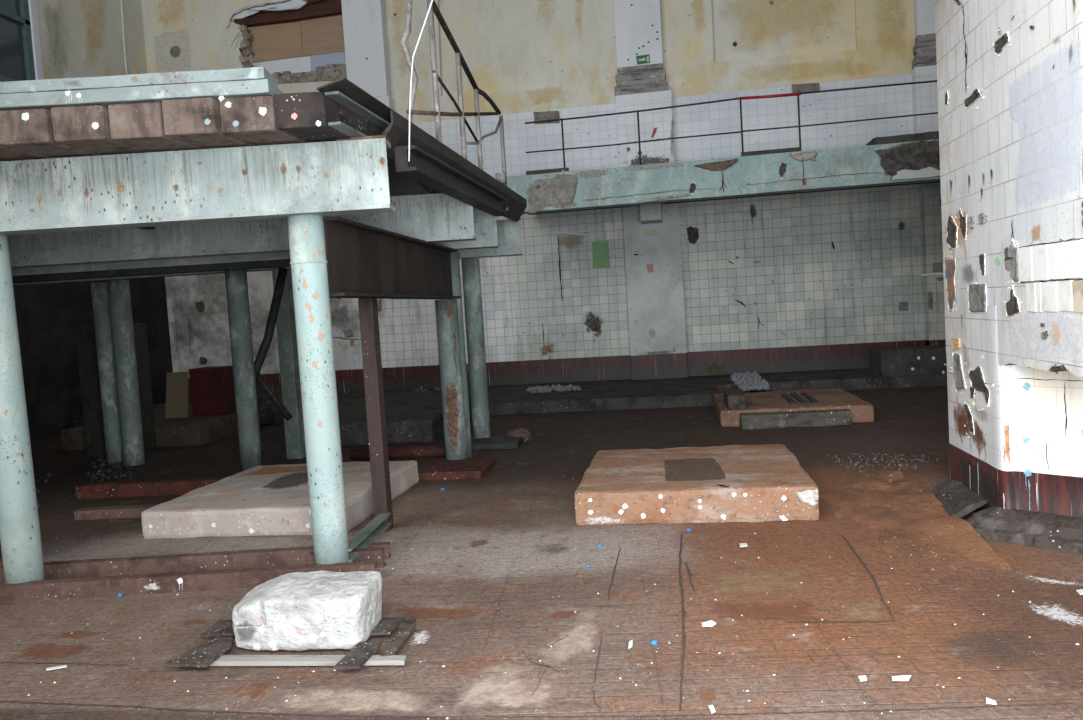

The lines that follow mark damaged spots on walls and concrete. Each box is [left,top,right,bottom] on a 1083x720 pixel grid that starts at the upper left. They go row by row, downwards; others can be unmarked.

peeling [229,0,308,68]
crack [961,10,969,89]
peeling [527,170,607,213]
spalling [633,182,700,203]
spalling [625,147,742,171]
peeling [885,152,940,181]
peeling [928,208,988,313]
peeling [1003,238,1027,317]
rust [446,385,458,446]
peeling [950,338,994,438]
rust [1003,425,1011,463]